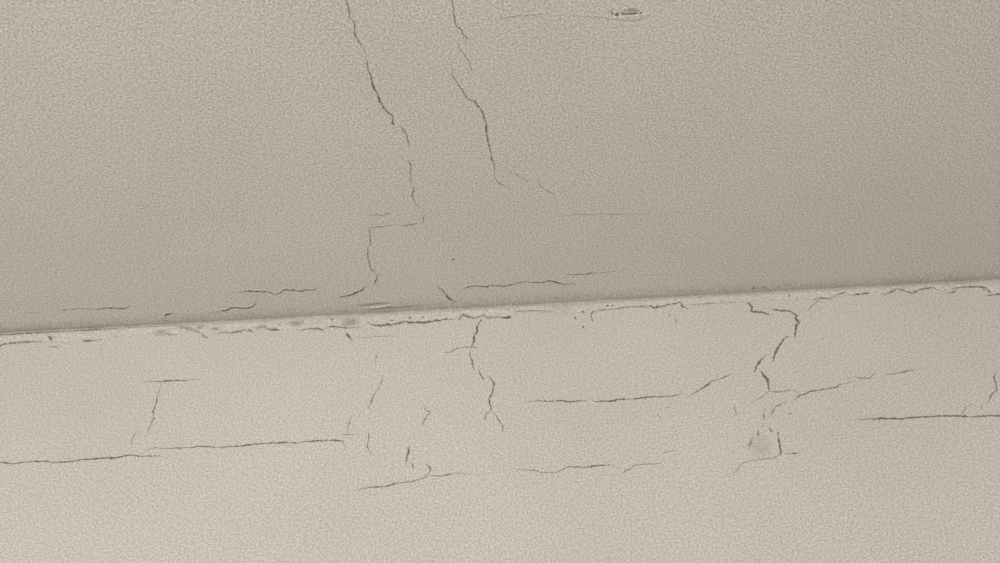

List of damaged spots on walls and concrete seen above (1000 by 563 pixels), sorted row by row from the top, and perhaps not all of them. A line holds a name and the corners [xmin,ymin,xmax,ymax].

crack [0,0,643,465]
crack [353,446,482,491]
crack [513,286,1000,476]